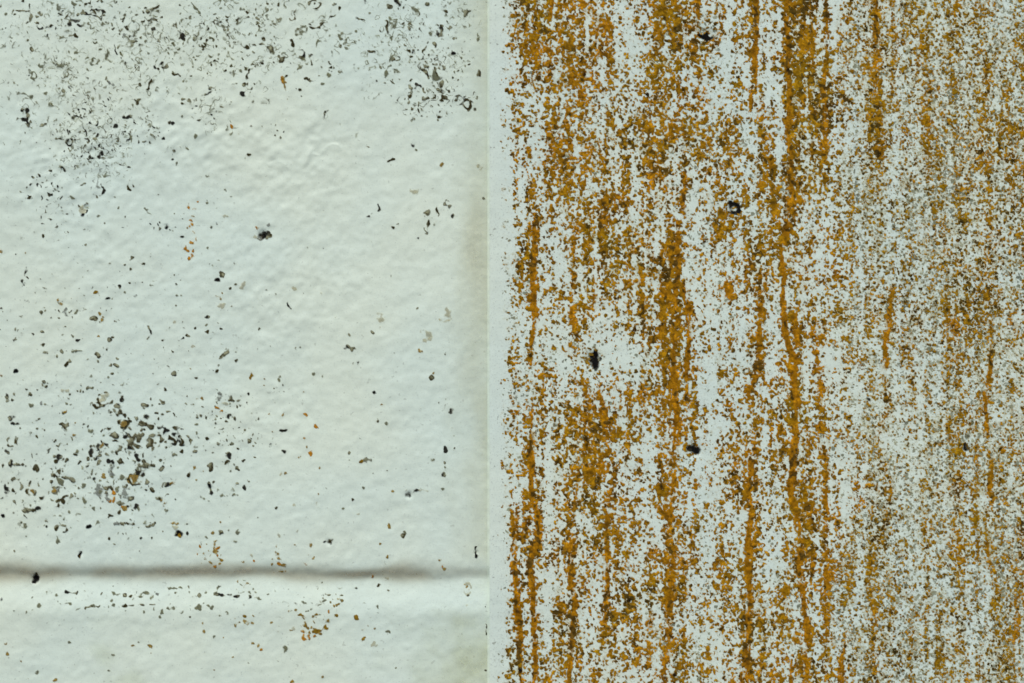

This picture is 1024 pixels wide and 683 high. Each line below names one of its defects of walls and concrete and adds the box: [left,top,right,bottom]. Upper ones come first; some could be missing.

rust [485,0,1024,683]